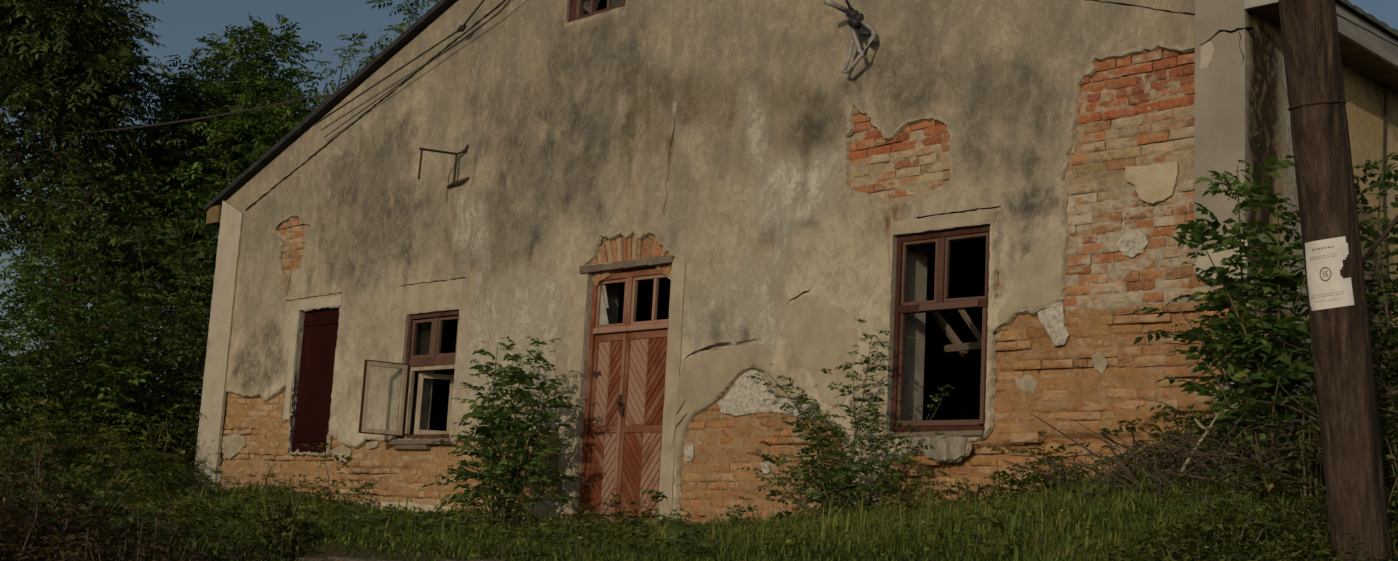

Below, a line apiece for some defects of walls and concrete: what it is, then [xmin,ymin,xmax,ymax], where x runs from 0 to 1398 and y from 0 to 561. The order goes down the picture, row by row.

flaking render [272,213,310,281]
flaking render [216,376,562,522]
leakage [450,188,564,411]
flaking render [583,229,672,289]
leakage [686,89,839,351]
flaking render [673,293,859,524]
flaking render [842,102,955,211]
flaking render [873,39,1254,509]